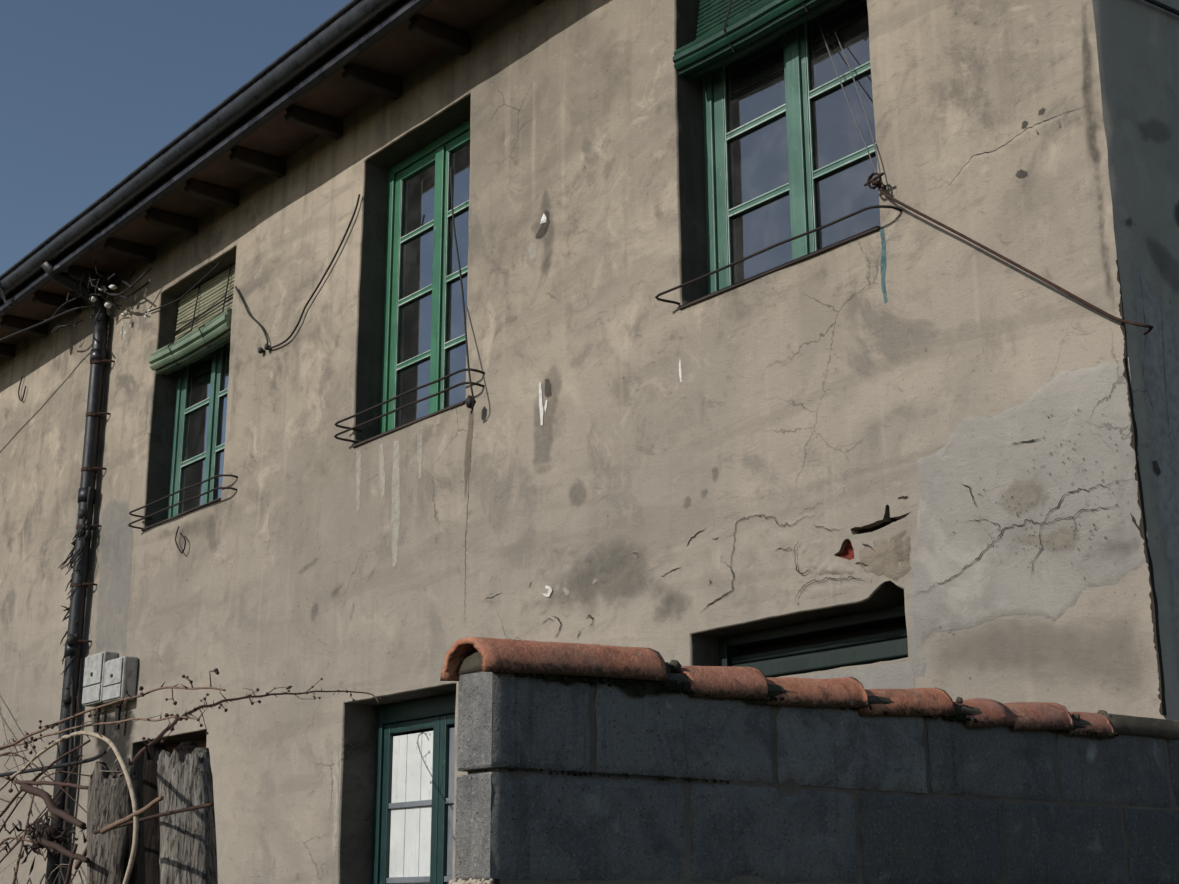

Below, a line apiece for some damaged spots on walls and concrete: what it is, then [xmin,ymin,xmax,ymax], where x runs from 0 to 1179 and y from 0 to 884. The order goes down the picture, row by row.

efflorescence [380,441,400,565]
crack [631,502,875,612]
spalling [834,504,911,560]
crack [907,260,1177,716]